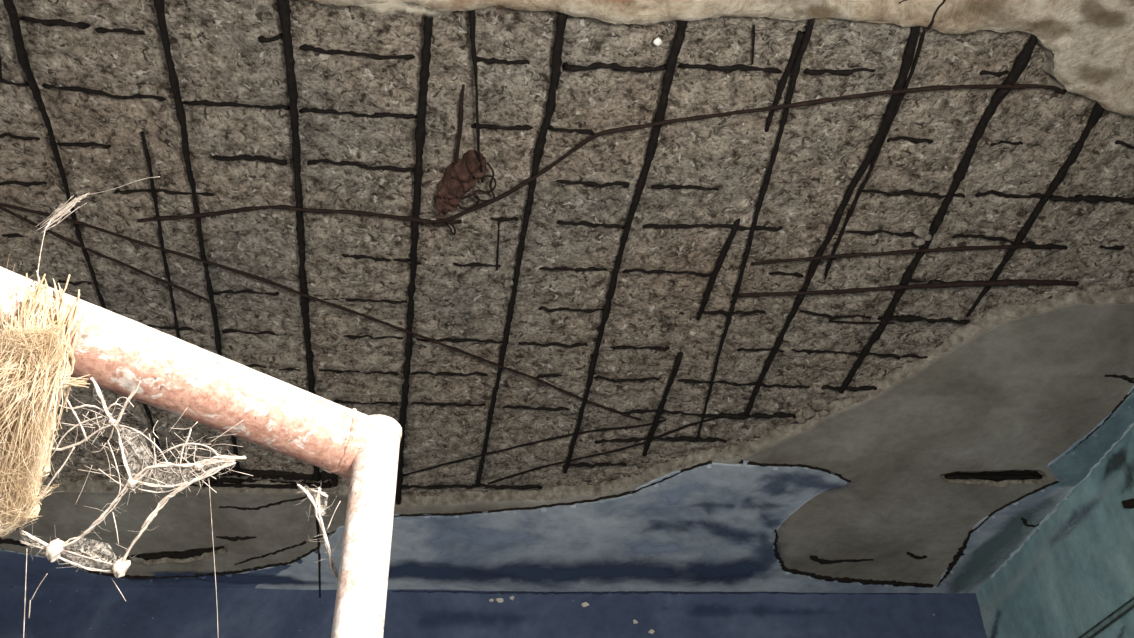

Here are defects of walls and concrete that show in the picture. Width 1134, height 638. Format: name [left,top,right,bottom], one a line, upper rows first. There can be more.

spalling [0,0,477,247]
spalling [0,88,998,520]
spalling [443,5,1134,417]
crack [928,0,946,30]
peeling [20,376,350,582]
peeling [739,306,1134,588]